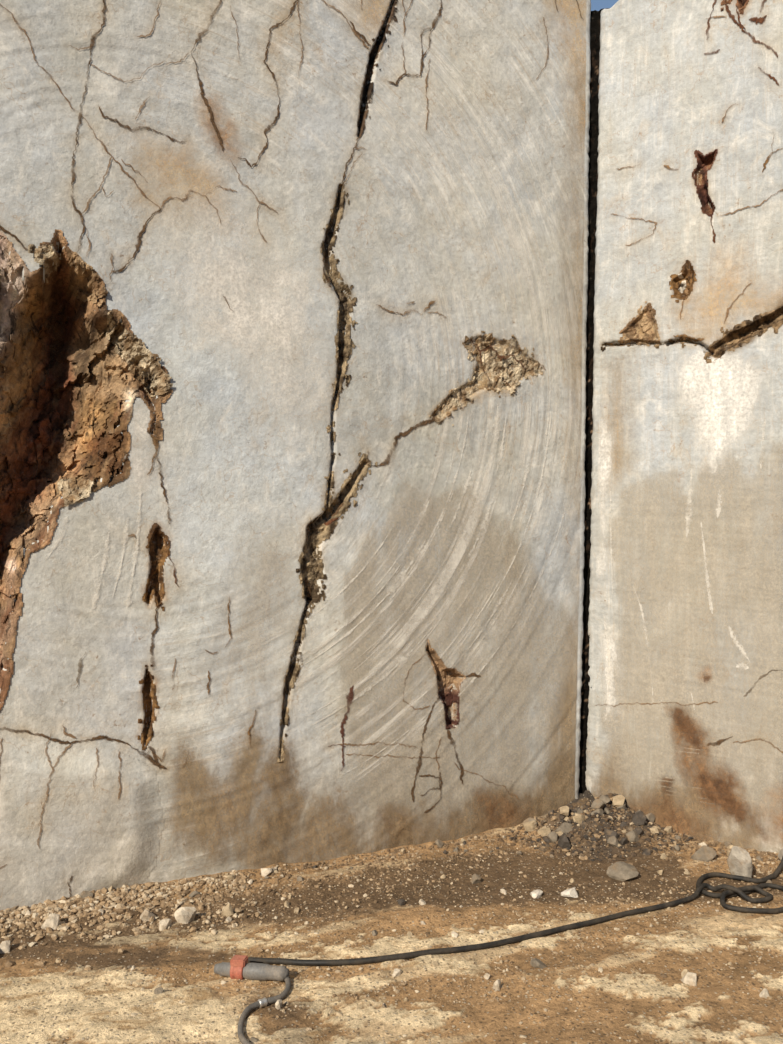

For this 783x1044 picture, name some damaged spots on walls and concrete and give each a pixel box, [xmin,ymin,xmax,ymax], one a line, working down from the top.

spalling [706,0,778,57]
peeling [188,218,305,404]
spalling [669,260,697,319]
crack [0,0,442,768]
spalling [429,331,546,426]
spalling [0,229,178,769]
water stain [308,441,577,826]
crack [0,725,187,850]
rust [661,778,673,820]
rust [673,708,761,832]